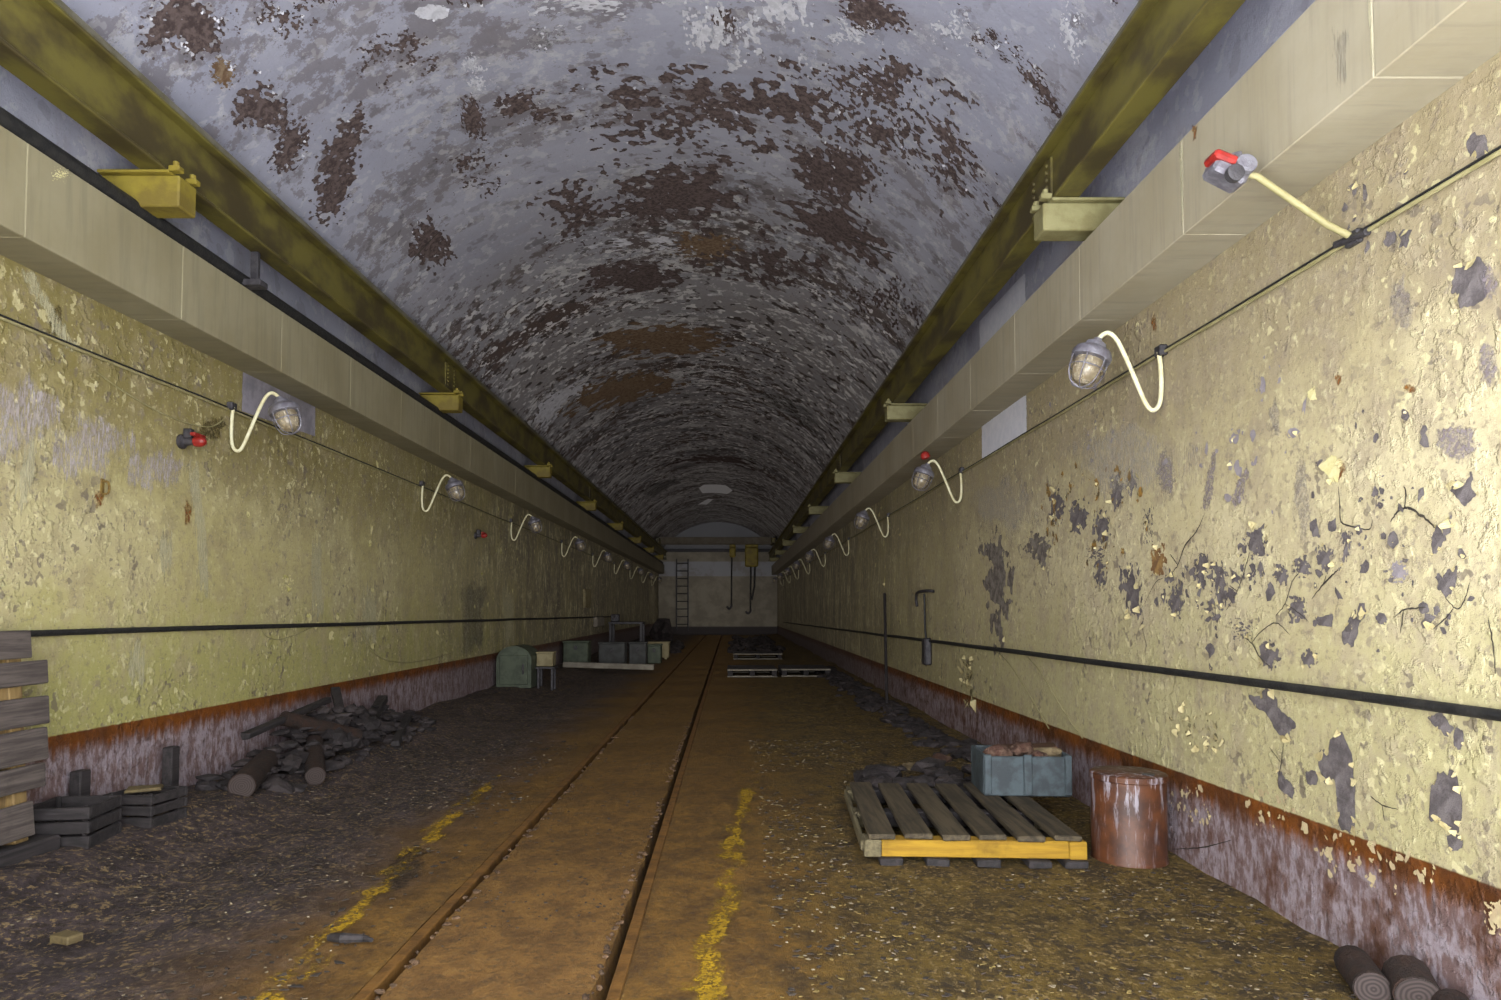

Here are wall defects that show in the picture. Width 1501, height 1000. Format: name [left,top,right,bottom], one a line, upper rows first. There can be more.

leakage [530,378,593,432]
peeling [1401,409,1429,447]
peeling [978,418,1479,672]
peeling [1169,701,1225,753]
peeling [1249,688,1296,743]
peeling [1167,785,1211,826]
peeling [1245,729,1436,895]
peeling [1428,713,1464,852]